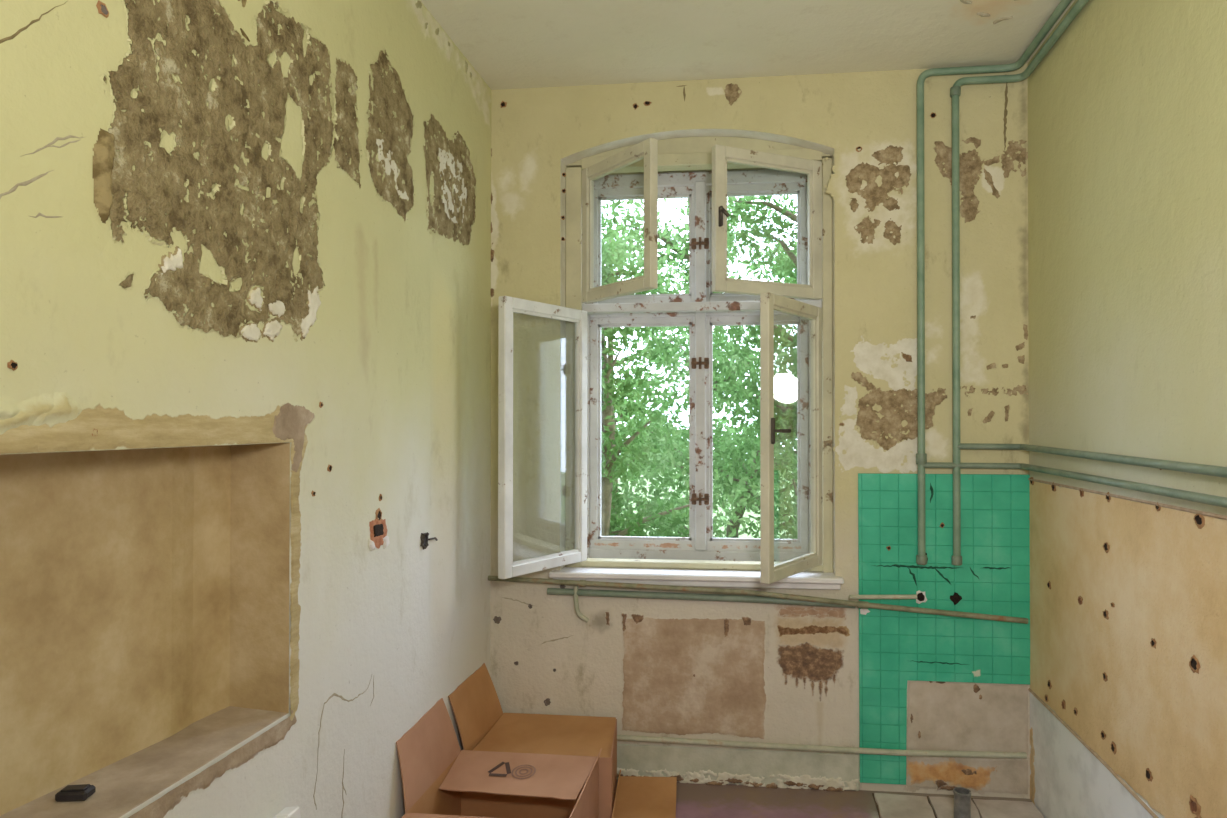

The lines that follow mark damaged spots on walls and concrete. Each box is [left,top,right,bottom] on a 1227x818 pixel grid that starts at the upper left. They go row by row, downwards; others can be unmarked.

crack [0,2,66,44]
crack [0,135,84,199]
crack [30,211,61,219]
spalling [92,0,542,343]
peeling [825,129,1028,265]
peeling [833,265,1029,474]
peeling [621,612,645,633]
peeling [724,616,752,637]
crack [313,676,374,818]